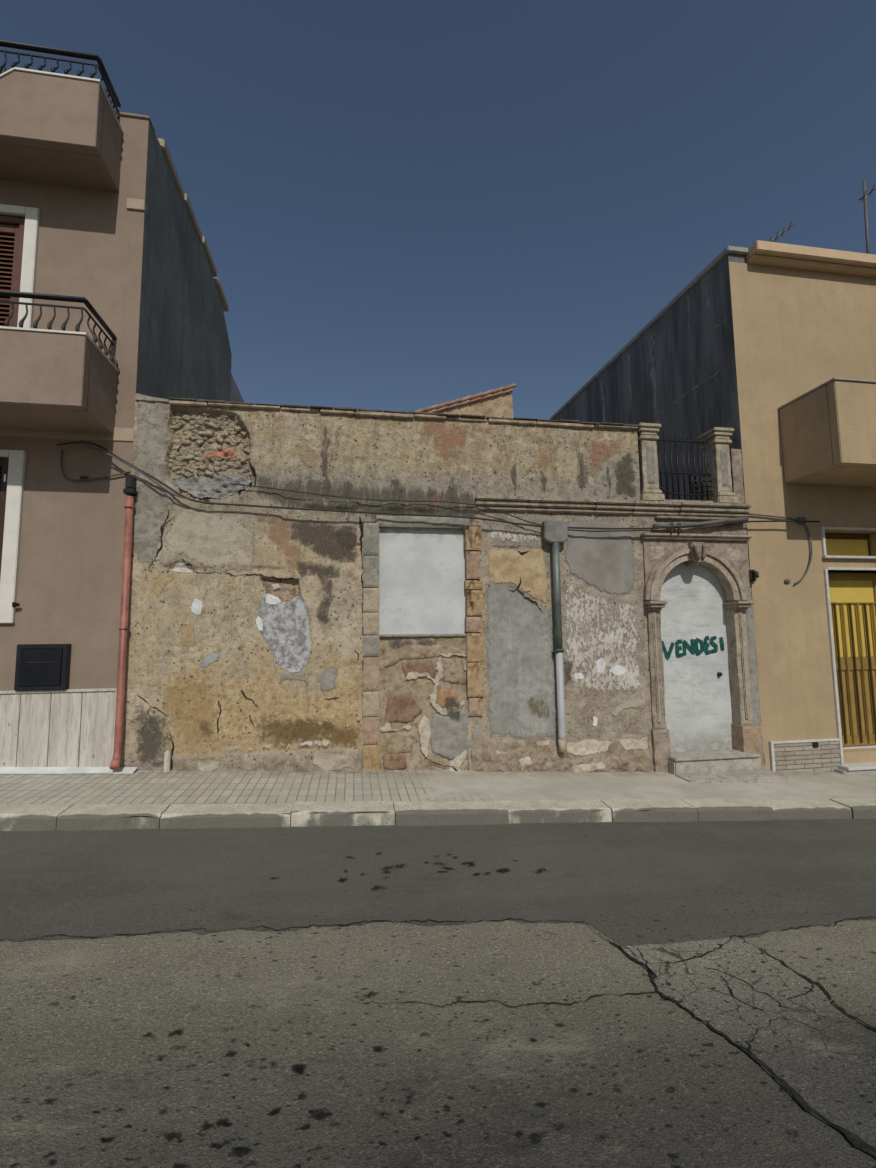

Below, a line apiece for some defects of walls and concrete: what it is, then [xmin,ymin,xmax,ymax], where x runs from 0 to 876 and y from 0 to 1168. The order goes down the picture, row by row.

crack [149,511,295,581]
flaking render [159,407,312,673]
leakage [257,426,477,623]
flaking render [488,529,548,603]
peeling [564,579,646,716]
leakage [136,683,211,766]
leakage [248,719,358,750]
flaking render [418,713,431,757]
flaking render [448,716,652,772]